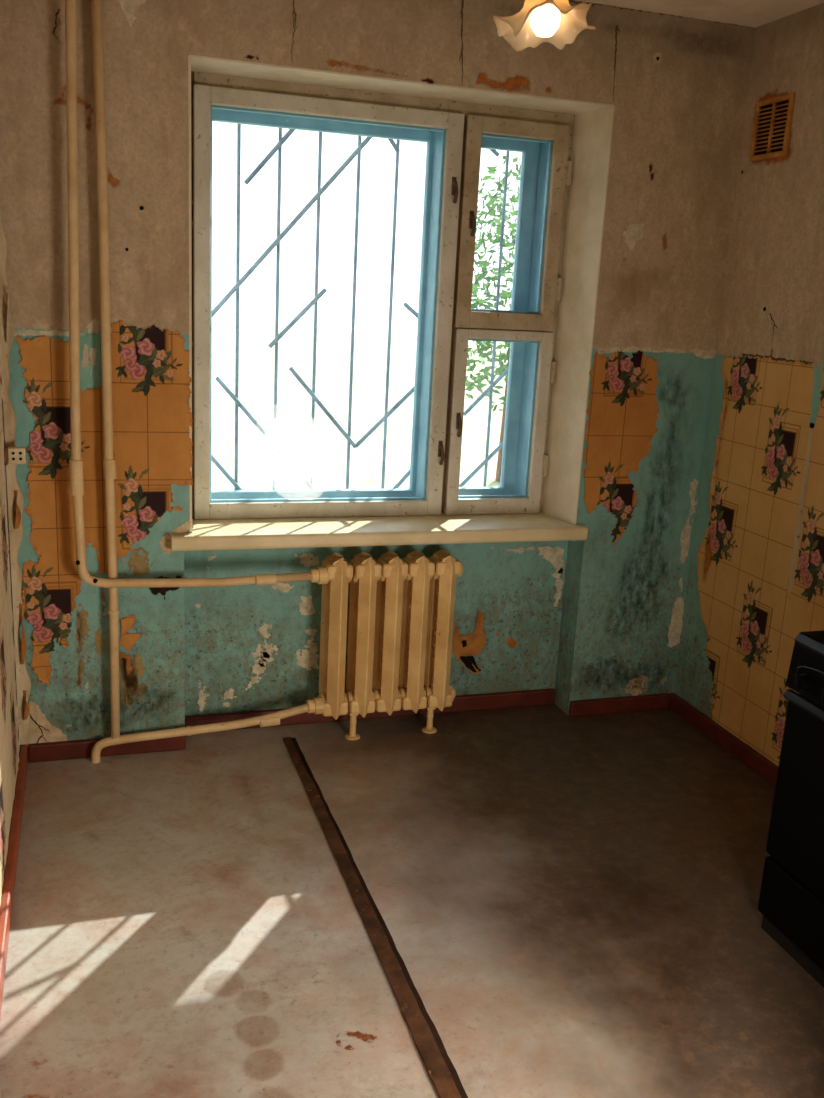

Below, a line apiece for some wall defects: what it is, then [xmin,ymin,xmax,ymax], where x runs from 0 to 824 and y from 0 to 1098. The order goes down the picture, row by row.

crack [53,9,62,44]
crack [290,0,298,62]
crack [569,0,749,101]
peeling [14,319,101,392]
spalling [159,520,193,554]
peeling [128,545,181,599]
peeling [272,582,315,615]
peeling [76,603,105,690]
peeling [119,633,148,706]
peeling [296,629,320,671]
peeling [460,640,481,672]
spalling [20,690,72,746]